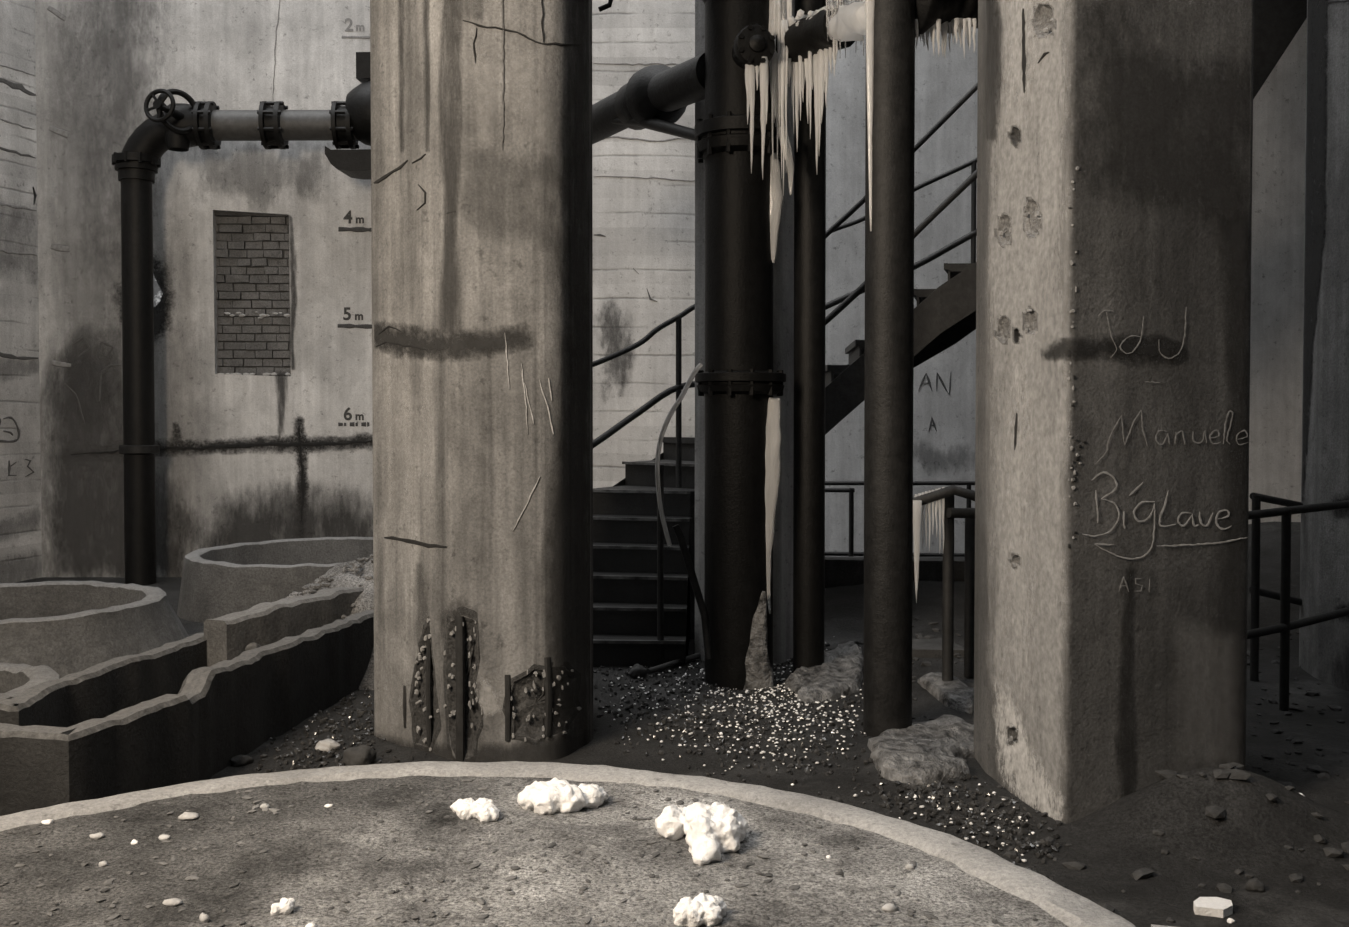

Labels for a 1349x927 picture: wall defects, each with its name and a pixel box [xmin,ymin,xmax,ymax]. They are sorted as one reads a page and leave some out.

spalling [1032,2,1056,63]
crack [463,0,685,150]
spalling [1010,126,1022,146]
spalling [996,197,1042,247]
spalling [996,307,1038,345]
leakage [388,0,631,762]
spalling [403,606,574,762]